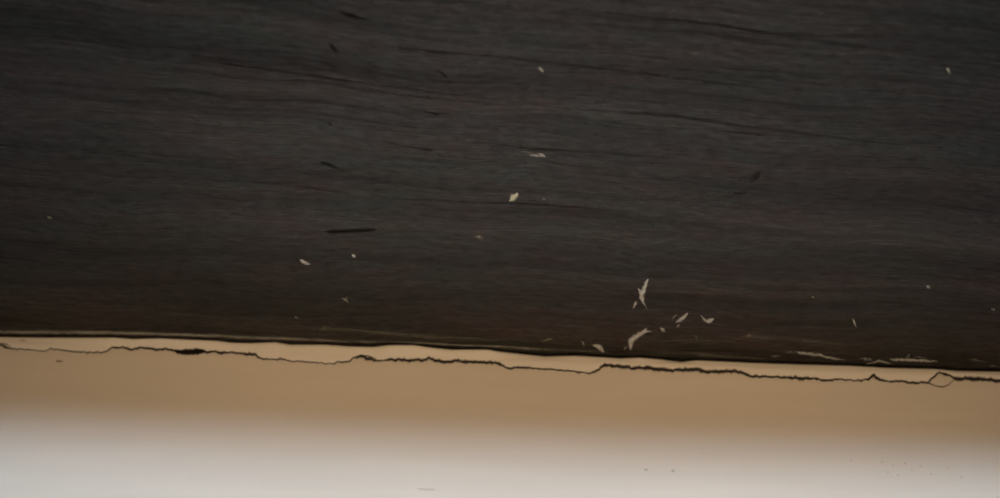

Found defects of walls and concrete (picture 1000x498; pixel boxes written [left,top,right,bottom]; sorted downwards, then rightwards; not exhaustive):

crack [62,346,1000,387]